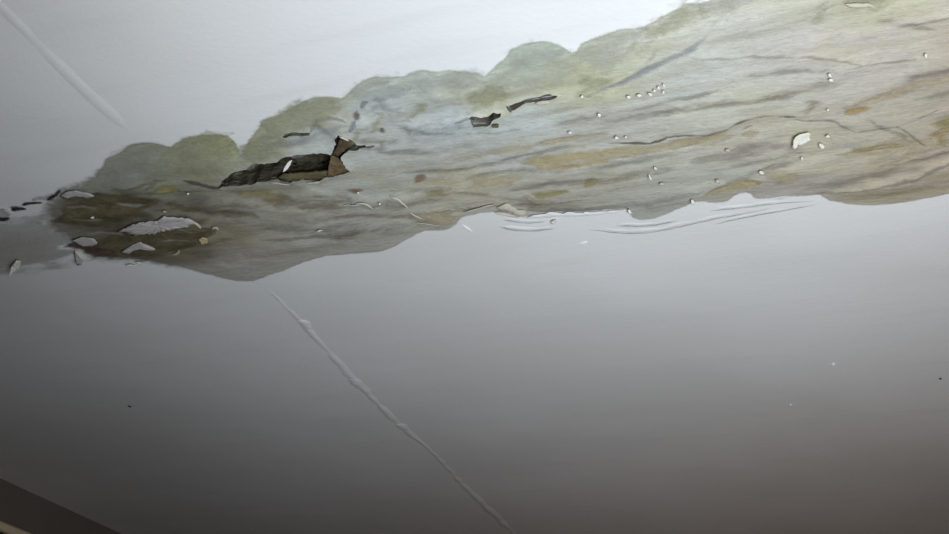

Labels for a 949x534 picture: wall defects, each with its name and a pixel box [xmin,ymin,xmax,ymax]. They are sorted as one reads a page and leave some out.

spalling [184,101,375,195]
water stain [48,0,949,281]
spalling [455,94,557,128]
peeling [55,190,247,267]